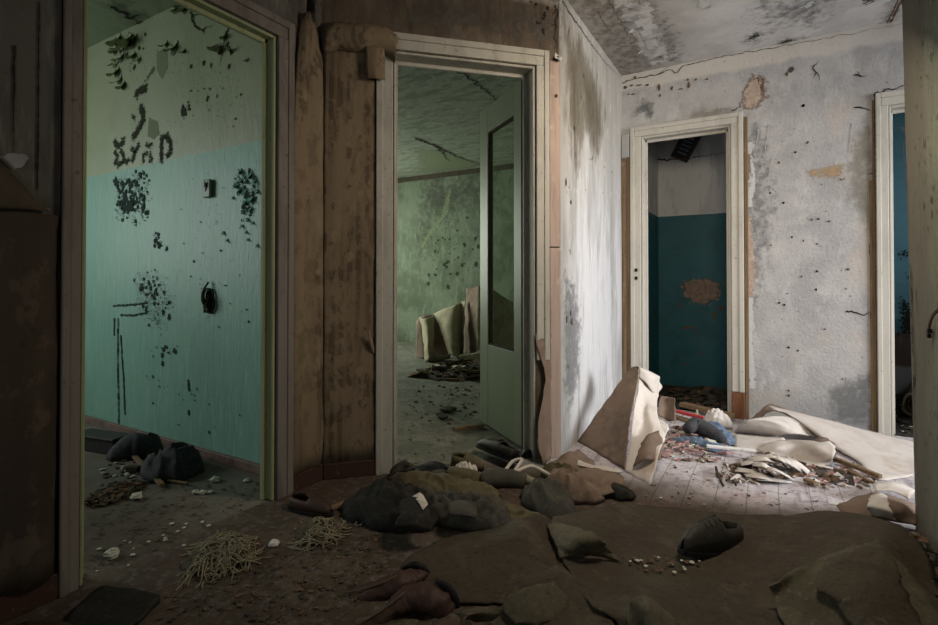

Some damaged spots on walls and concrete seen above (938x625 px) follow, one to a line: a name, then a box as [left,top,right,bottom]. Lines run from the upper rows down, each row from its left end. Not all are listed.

peeling [104,32,248,128]